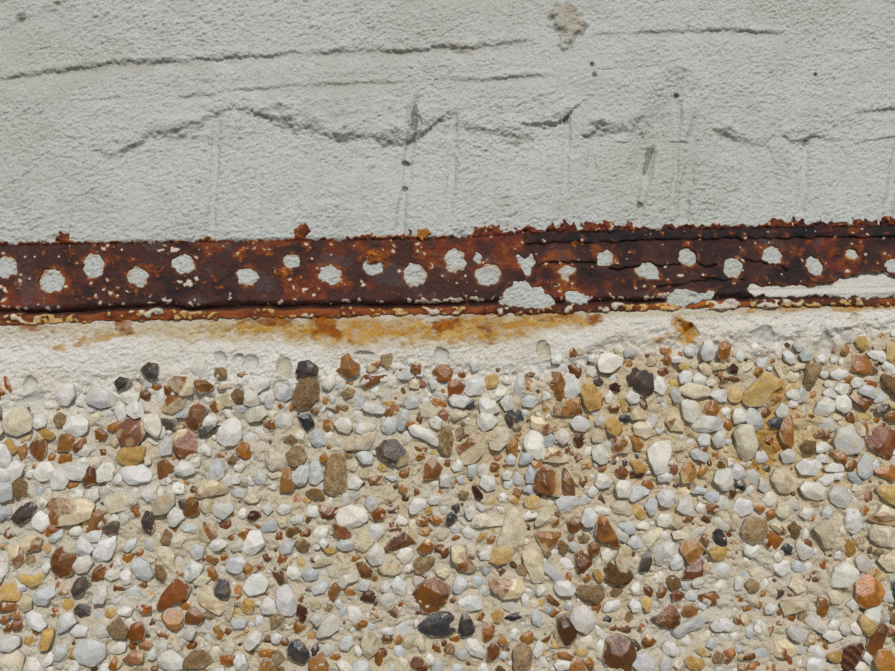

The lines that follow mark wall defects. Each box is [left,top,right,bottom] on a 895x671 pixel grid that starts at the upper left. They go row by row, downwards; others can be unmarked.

rust [0,231,158,245]
rust [277,223,455,265]
rust [468,219,649,248]
rust [660,215,895,230]
rust [747,271,895,312]
rust [93,321,132,342]
rust [237,281,603,344]
rust [666,289,715,343]